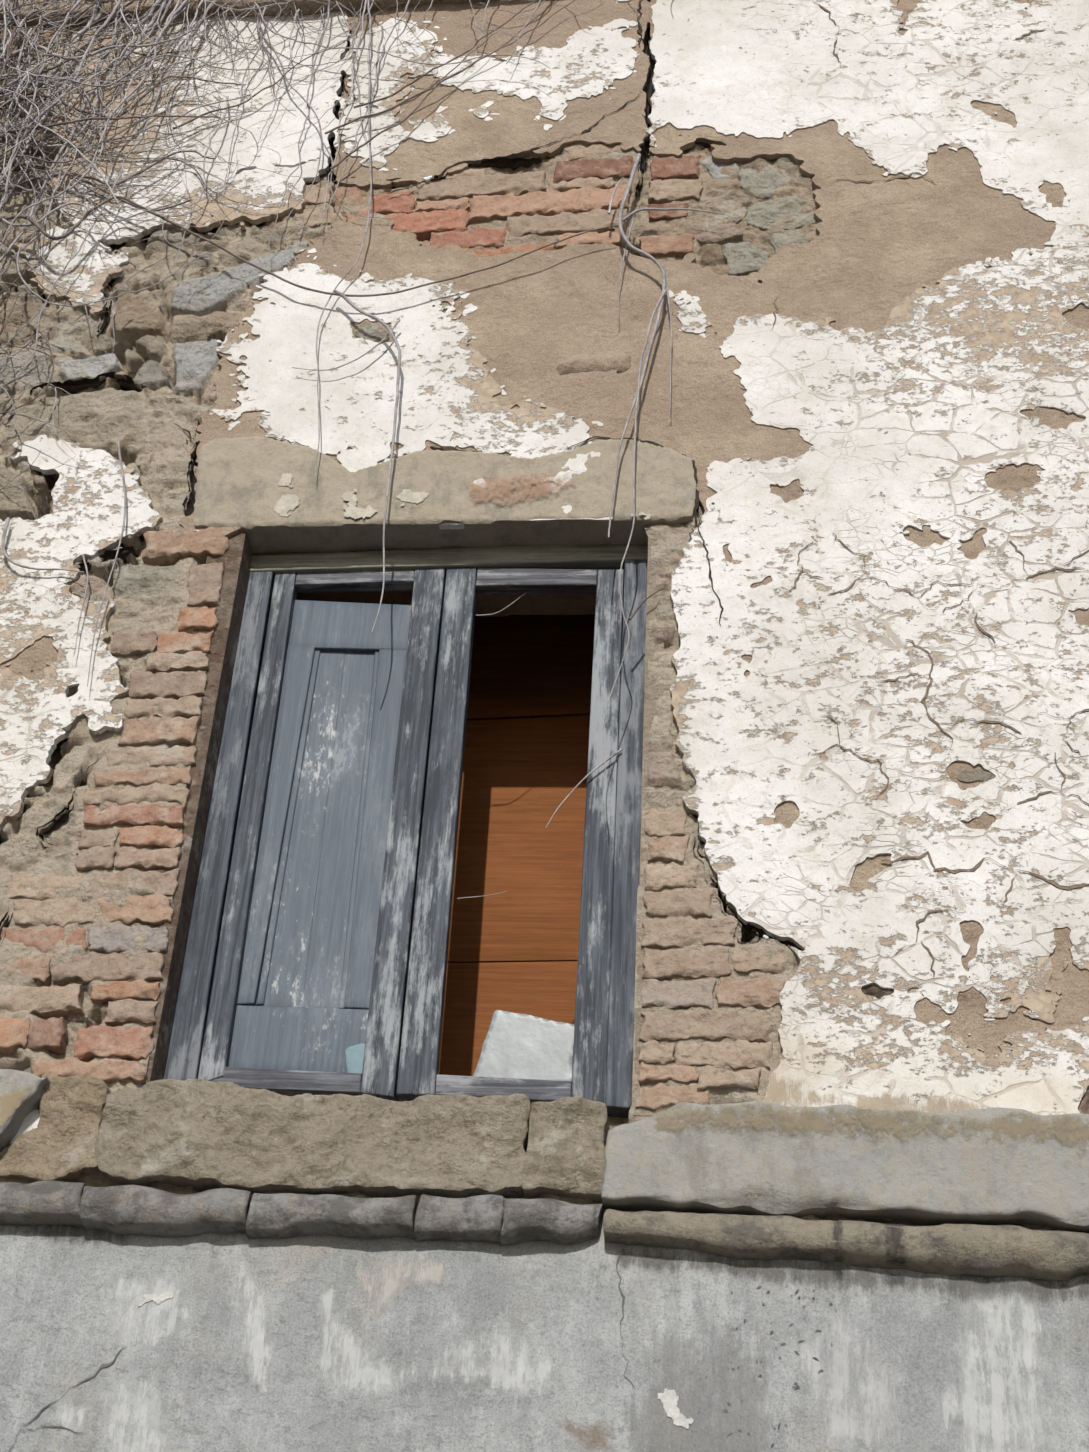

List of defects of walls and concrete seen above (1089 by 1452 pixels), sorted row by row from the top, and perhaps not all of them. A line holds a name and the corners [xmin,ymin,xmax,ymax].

crack [387,0,657,200]
peeling [285,0,1066,514]
peeling [179,299,276,538]
peeling [1020,407,1085,429]
crack [74,420,201,572]
peeling [903,526,987,559]
crack [789,533,1089,804]
peeling [946,762,996,790]
crack [693,835,803,951]
crack [895,909,965,976]
crack [881,851,1089,902]
peeling [907,921,1089,1060]